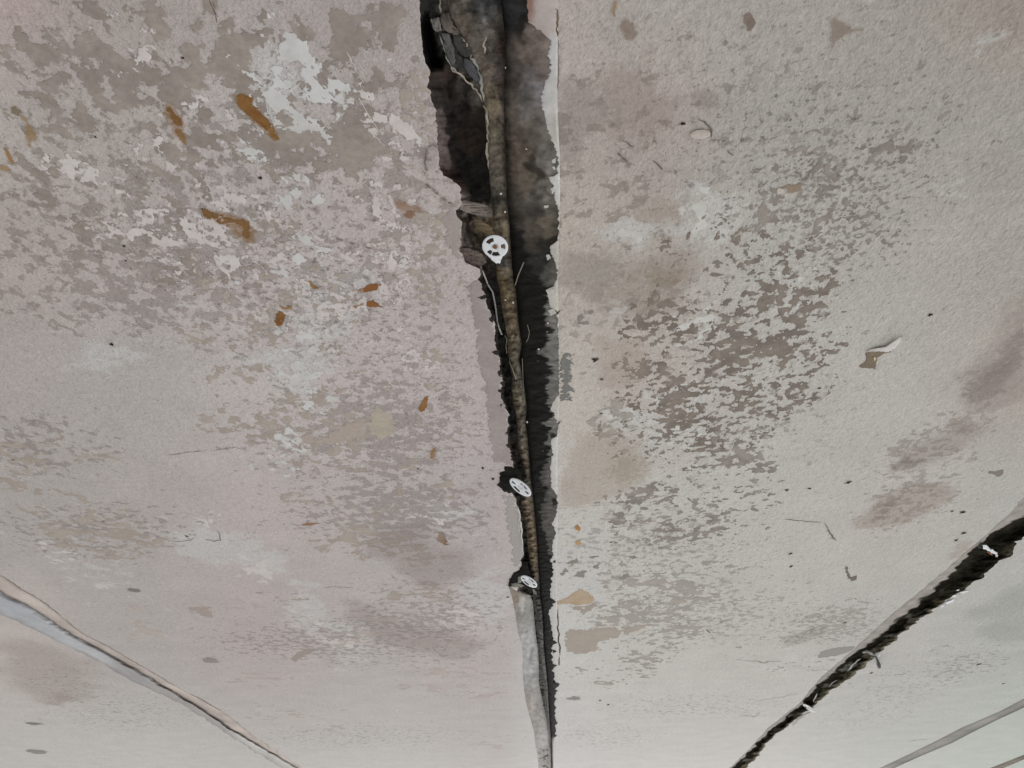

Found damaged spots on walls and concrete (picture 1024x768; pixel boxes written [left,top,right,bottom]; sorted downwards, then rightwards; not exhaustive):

corrosion [166,107,187,145]
corrosion [237,94,278,140]
peeling [527,0,562,337]
corrosion [201,208,250,239]
corrosion [274,305,292,326]
corrosion [353,284,383,308]
peeling [0,0,556,768]
peeling [548,92,966,689]
peeling [896,360,1013,467]